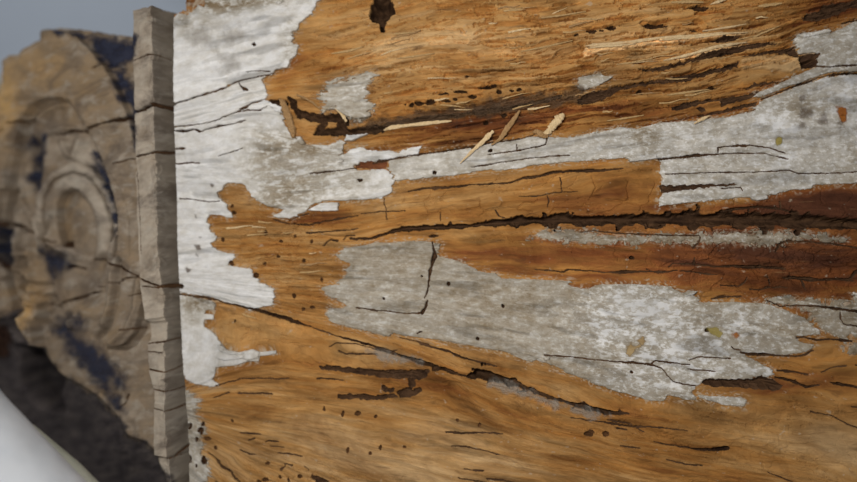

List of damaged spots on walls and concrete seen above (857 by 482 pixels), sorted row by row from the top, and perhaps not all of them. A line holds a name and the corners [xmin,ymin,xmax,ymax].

crack [56,70,274,251]
crack [0,134,857,466]
peeling [173,0,857,482]